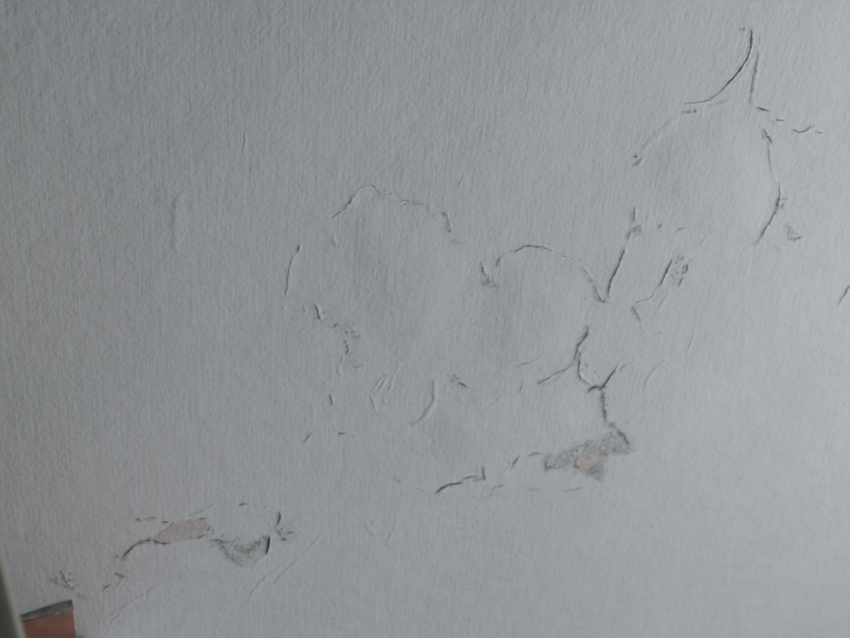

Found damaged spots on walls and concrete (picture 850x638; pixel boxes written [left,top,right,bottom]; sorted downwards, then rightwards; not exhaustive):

crack [681,27,759,107]
crack [756,106,823,239]
crack [330,184,460,244]
crack [281,242,307,314]
crack [495,233,632,303]
crack [837,284,850,306]
crack [515,327,629,420]
crack [435,473,477,498]
crack [501,450,542,474]
flaking render [544,422,634,480]
flaking render [122,503,310,570]